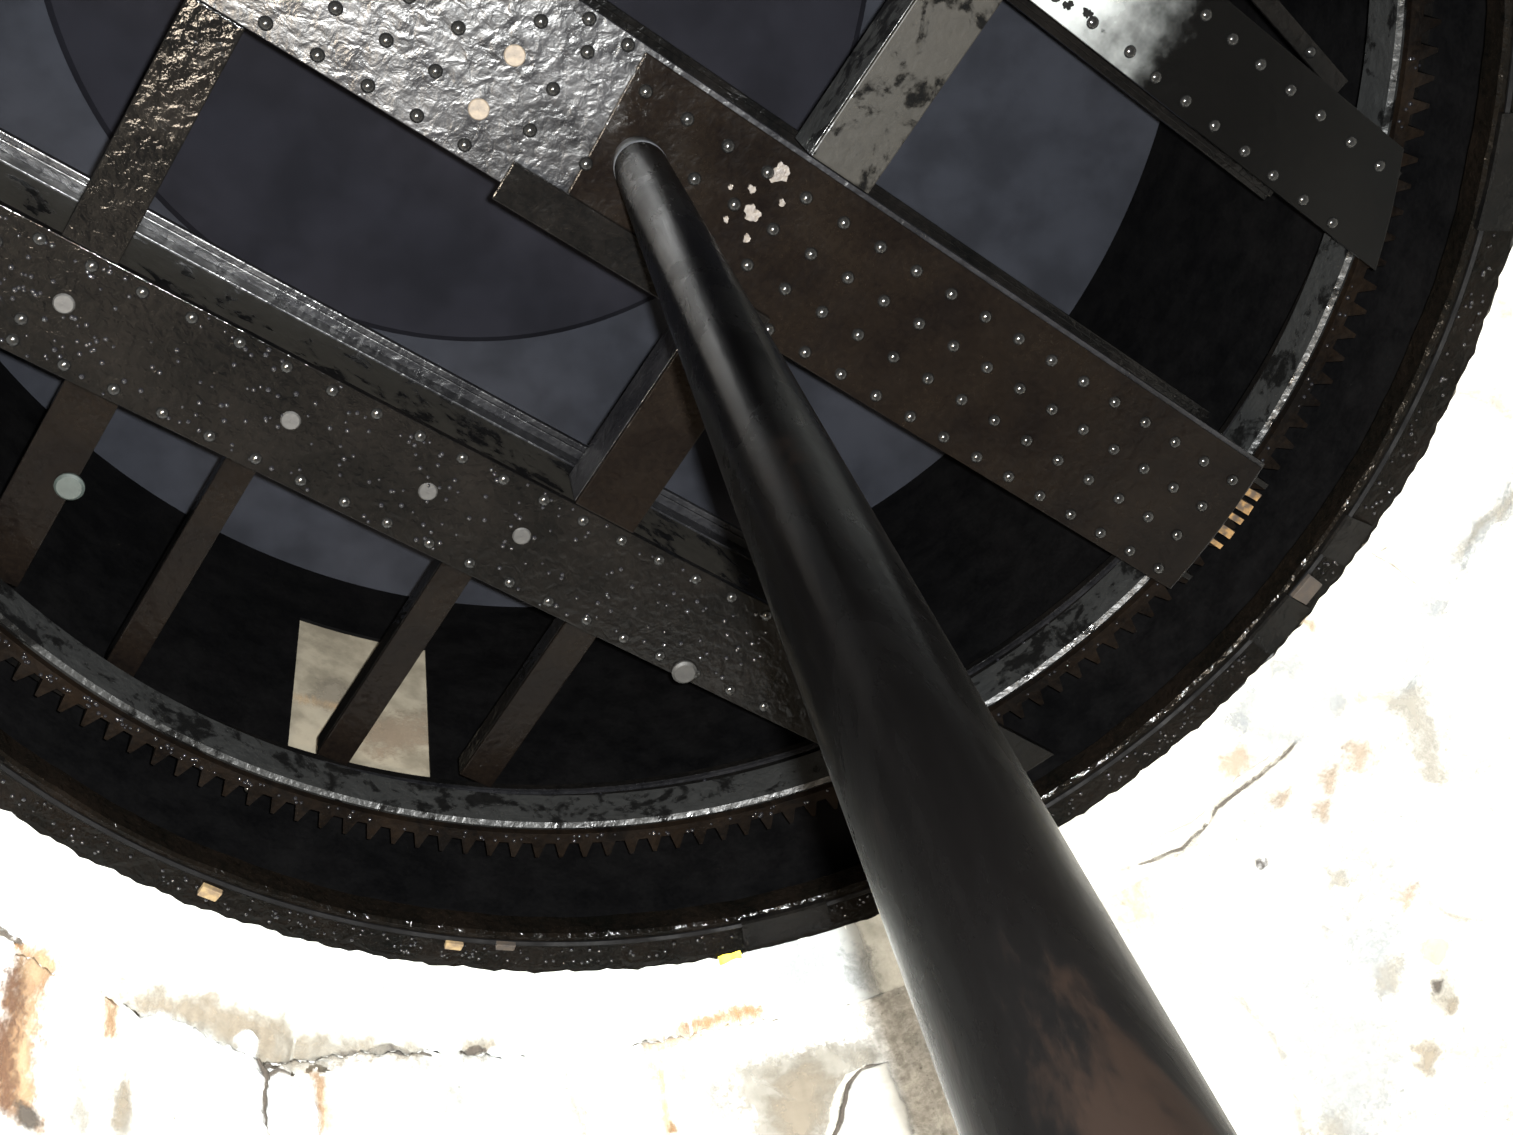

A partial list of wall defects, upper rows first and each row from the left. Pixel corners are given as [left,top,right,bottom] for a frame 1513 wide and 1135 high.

crack [1126,741,1297,869]
crack [0,897,36,950]
rust [0,943,55,1132]
crack [256,1043,487,1135]